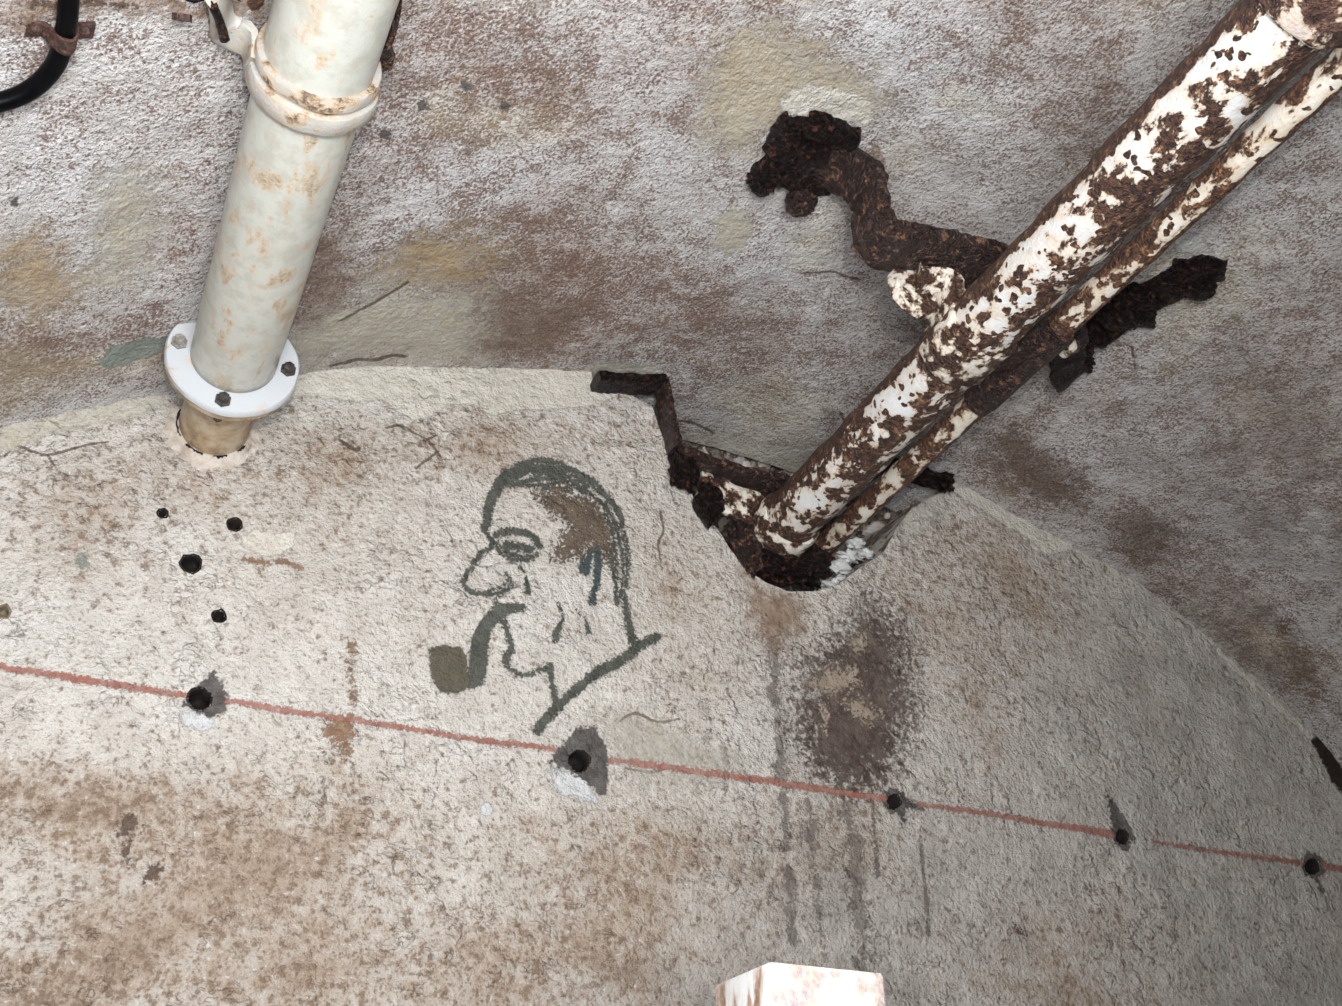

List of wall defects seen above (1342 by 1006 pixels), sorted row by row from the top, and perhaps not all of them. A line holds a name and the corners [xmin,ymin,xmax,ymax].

damp [778,587,928,878]
damp [920,844,930,937]